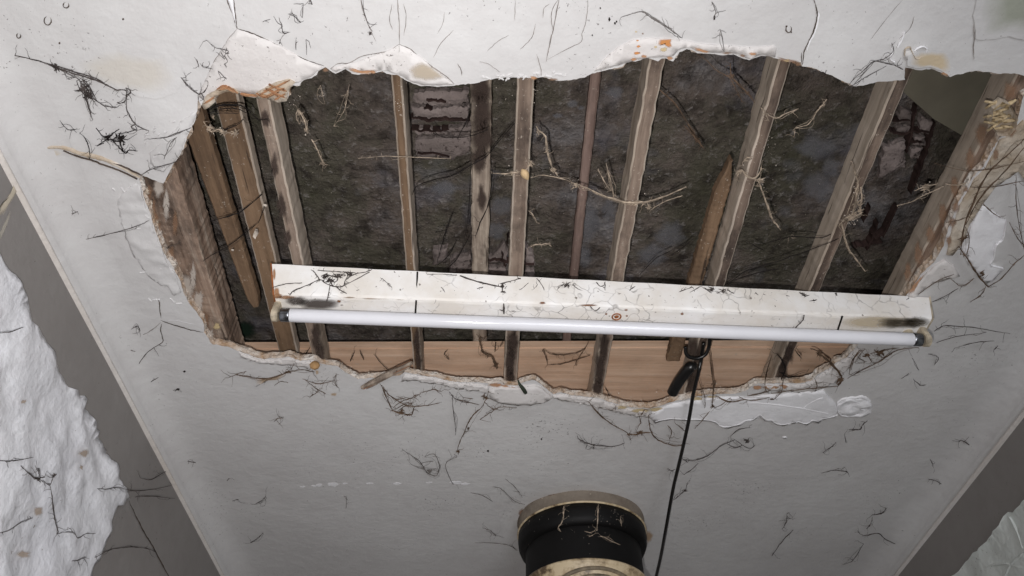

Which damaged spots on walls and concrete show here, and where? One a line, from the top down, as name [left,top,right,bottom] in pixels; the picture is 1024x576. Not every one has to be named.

corrosion [631,31,673,61]
peeling [595,37,777,71]
peeling [199,29,471,160]
flaking render [876,102,935,195]
peeling [907,97,1024,298]
flaking render [851,202,898,251]
flaking render [432,243,472,274]
flaking render [488,231,509,276]
flaking render [523,241,535,277]
spalling [239,352,312,369]
peeling [401,349,861,439]